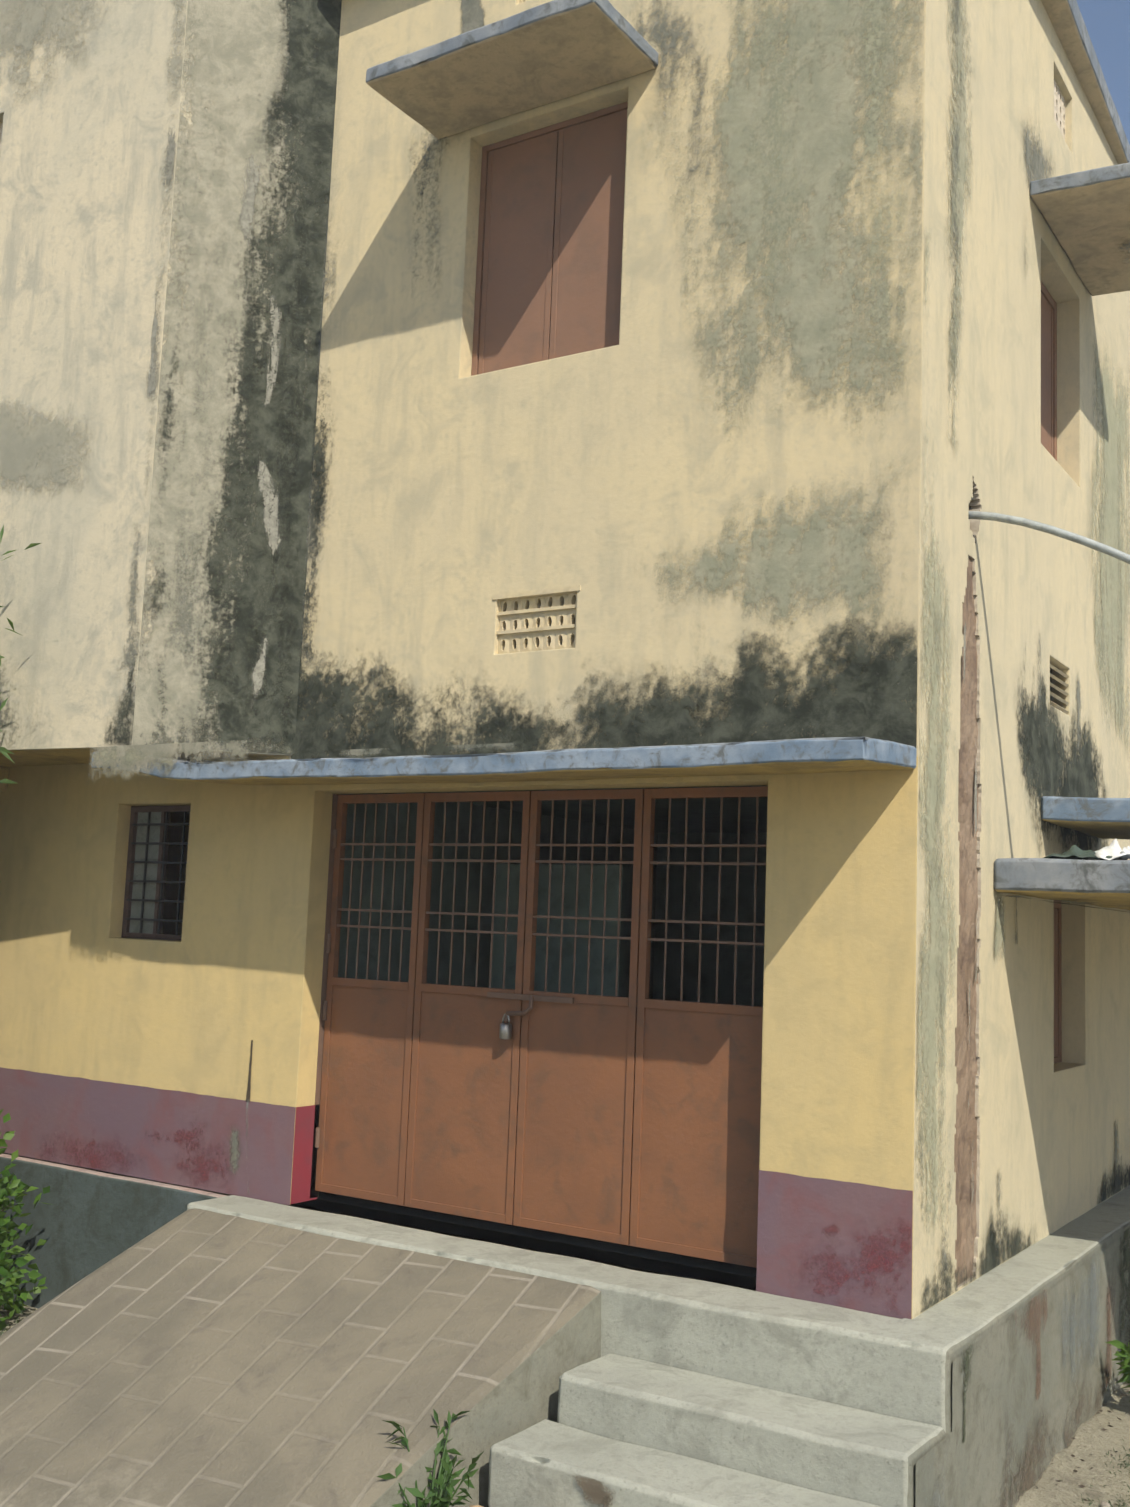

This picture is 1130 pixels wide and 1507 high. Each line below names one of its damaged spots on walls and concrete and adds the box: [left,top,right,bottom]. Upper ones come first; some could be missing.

water stain [0,0,94,95]
water stain [0,401,89,489]
water stain [90,0,918,777]
water stain [1017,678,1107,851]
flaking render [954,477,982,1288]
water stain [921,1173,1031,1312]